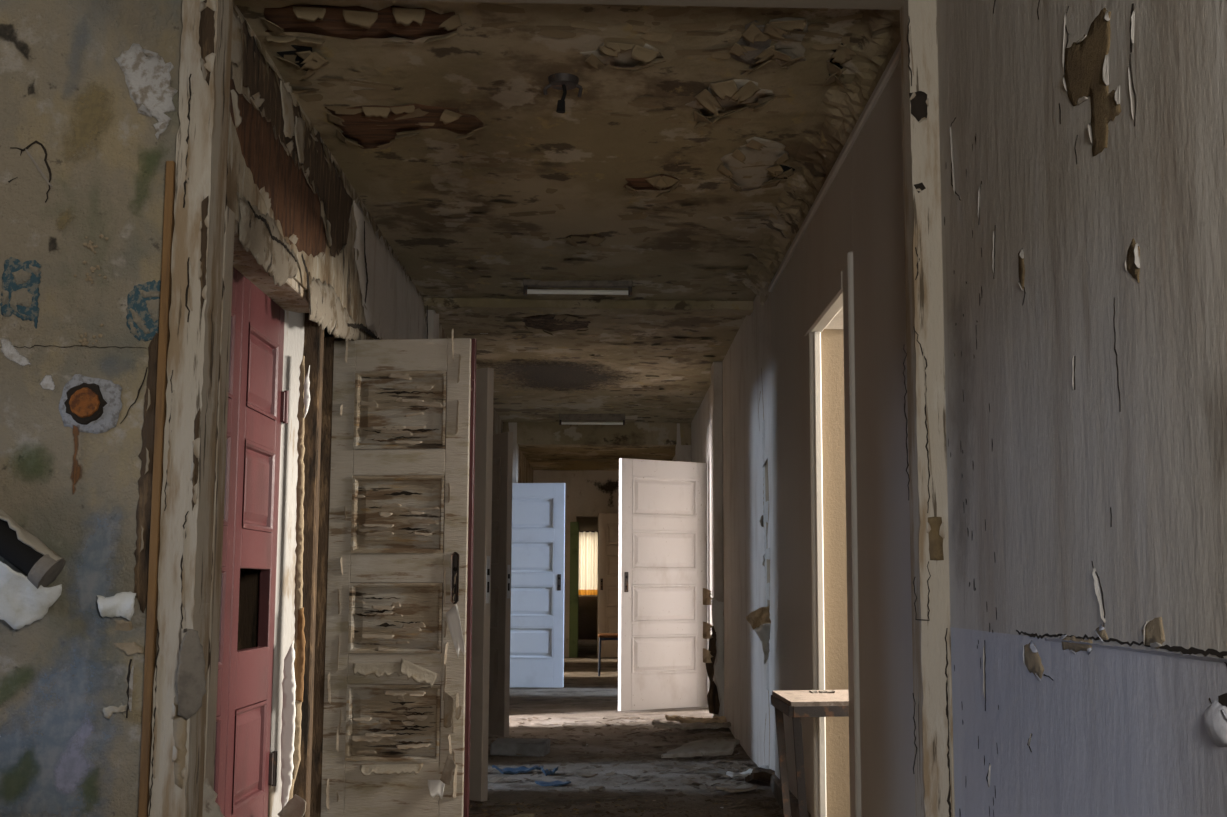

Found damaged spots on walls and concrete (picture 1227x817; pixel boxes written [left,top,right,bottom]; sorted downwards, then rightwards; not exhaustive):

crack [8,141,53,203]
peeling [115,43,177,139]
peeling [199,0,216,85]
flaking render [230,5,487,259]
peeling [685,17,808,130]
peeling [717,137,794,191]
peeling [1063,8,1121,156]
crack [911,693,919,774]
crack [913,561,953,817]
crack [980,640,988,711]
crack [984,763,992,788]
crack [1016,562,1227,719]